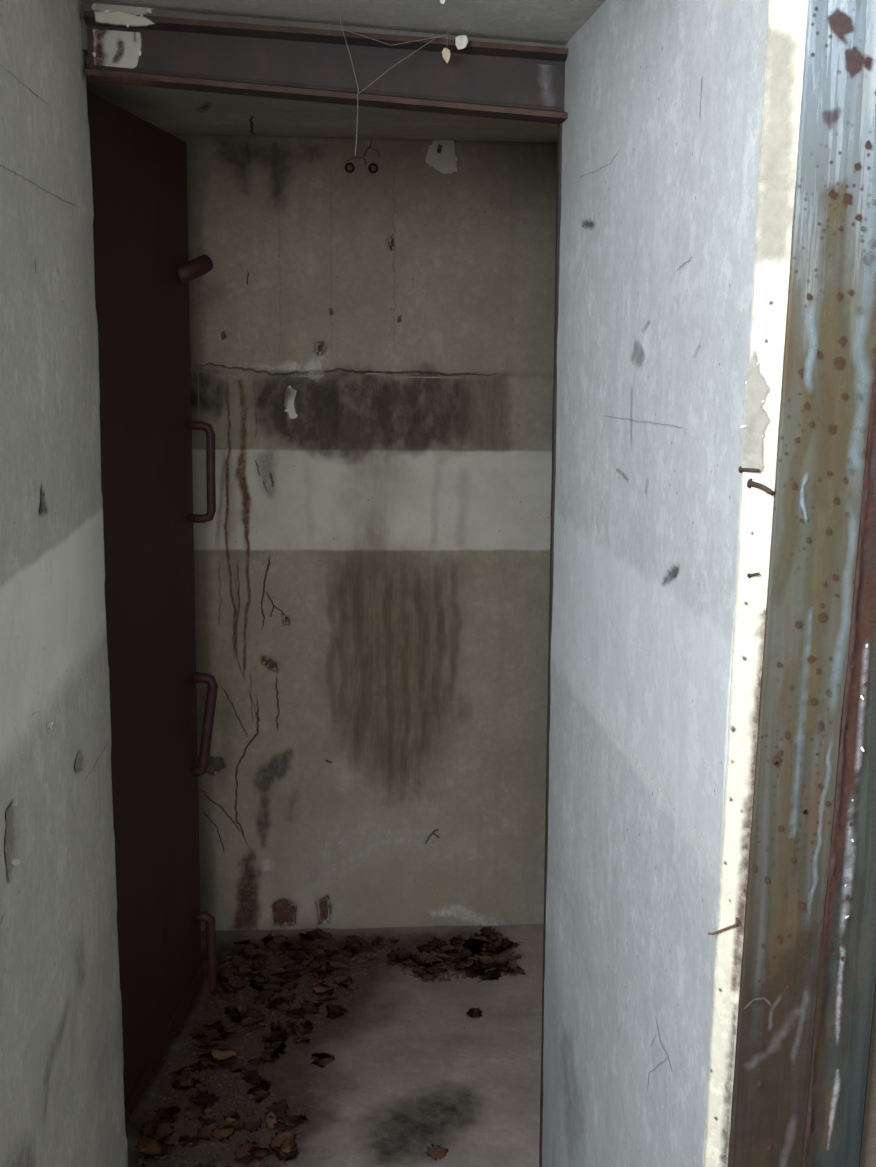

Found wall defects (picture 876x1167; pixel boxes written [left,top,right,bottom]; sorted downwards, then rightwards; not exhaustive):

rust [828,9,872,77]
peeling [284,386,297,419]
crack [210,363,479,376]
damp [256,373,457,456]
peeling [740,339,769,471]
rust [224,380,251,670]
crack [261,557,286,628]
rust [773,283,876,961]
damp [341,561,445,776]
flaking render [4,799,21,883]
crack [202,677,280,852]
damp [257,752,290,843]